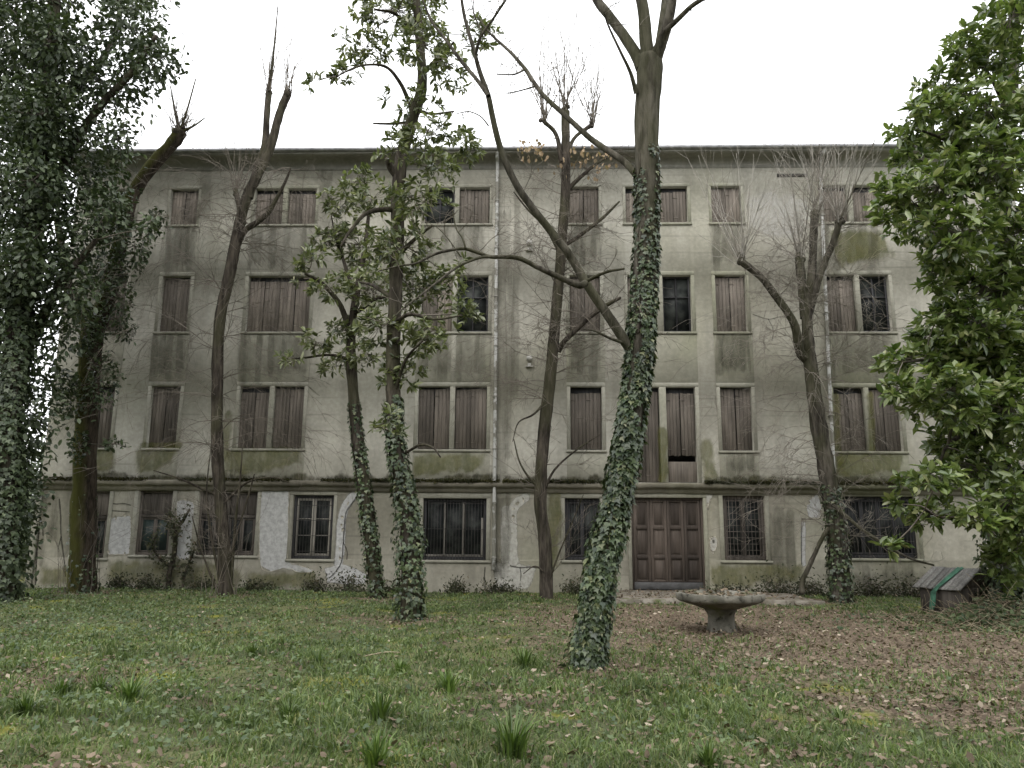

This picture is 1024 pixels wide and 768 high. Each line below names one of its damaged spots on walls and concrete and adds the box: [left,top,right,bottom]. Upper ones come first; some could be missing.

flaking render [107,514,132,555]
flaking render [176,498,198,561]
flaking render [258,491,366,584]
flaking render [494,493,535,589]